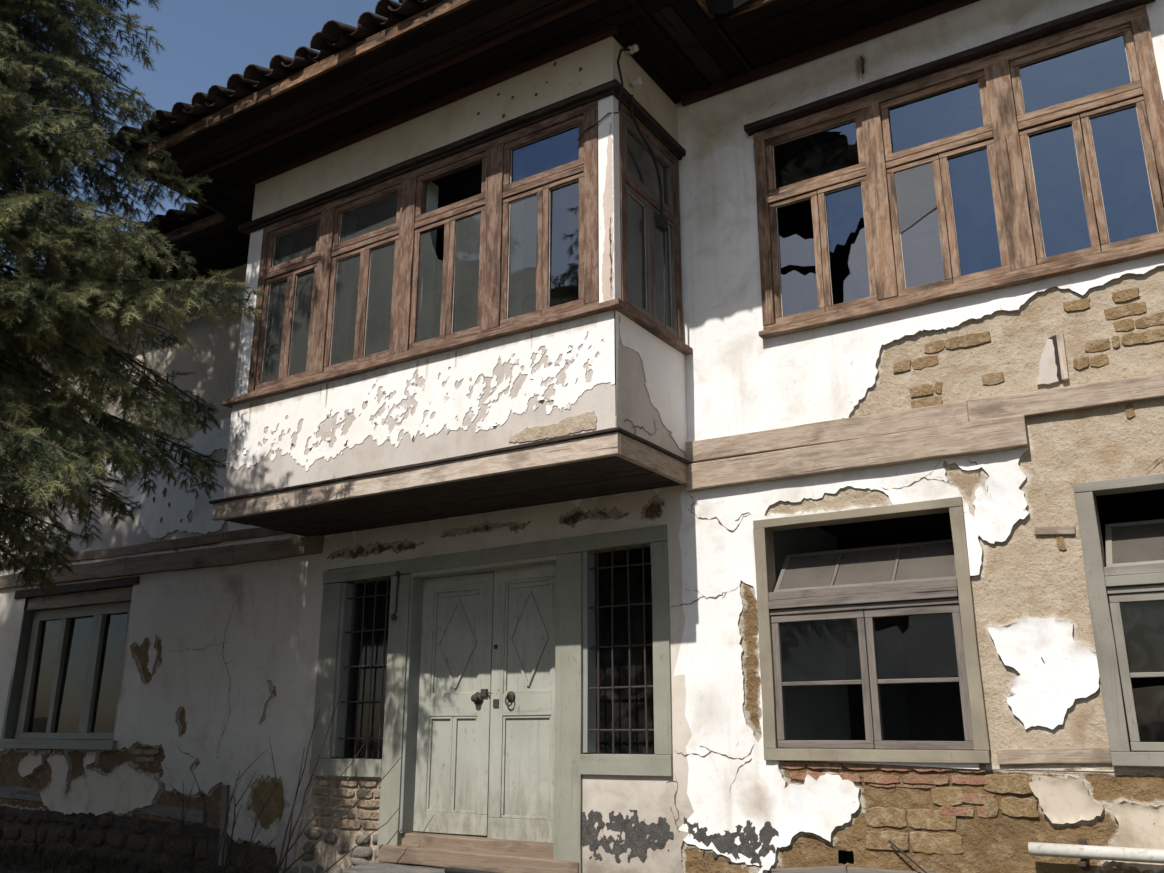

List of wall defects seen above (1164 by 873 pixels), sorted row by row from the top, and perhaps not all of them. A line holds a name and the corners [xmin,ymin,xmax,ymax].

peeling [602,123,614,302]
flaking render [849,265,1164,418]
peeling [0,316,686,574]
crack [689,493,749,532]
flaking render [130,634,163,685]
flaking render [175,706,187,738]
flaking render [582,398,1164,873]
flaking render [0,741,381,873]